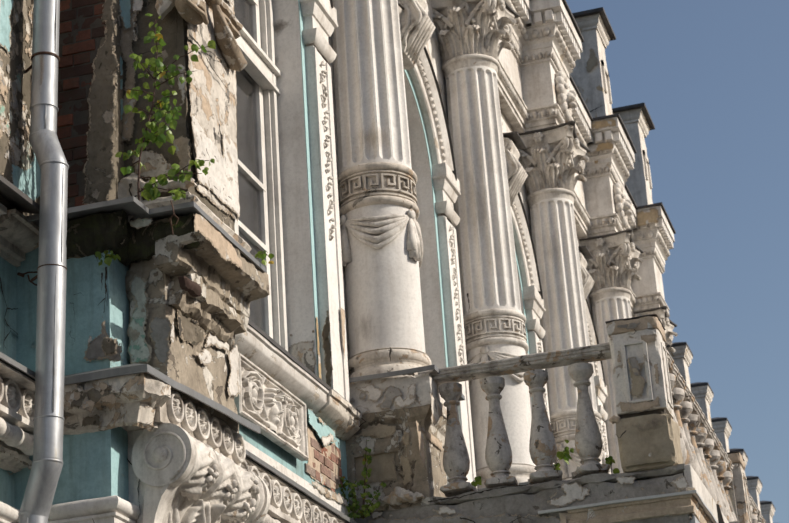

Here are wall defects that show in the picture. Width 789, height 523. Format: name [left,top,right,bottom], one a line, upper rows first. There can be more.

flaking render [0,0,41,202]
flaking render [57,0,240,221]
peeling [129,218,153,229]
peeling [194,213,243,269]
peeling [83,273,241,400]
flaking render [64,382,120,427]
flaking render [350,373,418,415]
peeling [430,393,446,425]
flaking render [305,409,349,507]
peeling [615,476,635,484]